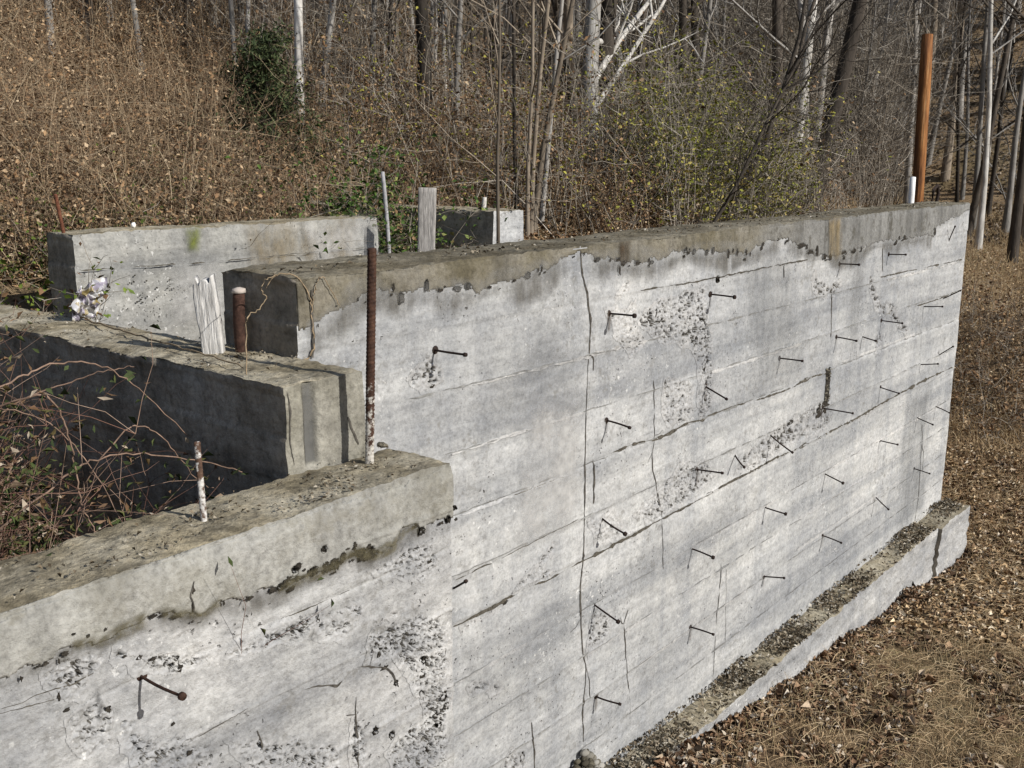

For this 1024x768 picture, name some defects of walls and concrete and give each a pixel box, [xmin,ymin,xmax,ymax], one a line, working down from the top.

peeling [295,204,970,476]
peeling [0,466,560,768]
crack [572,252,595,742]